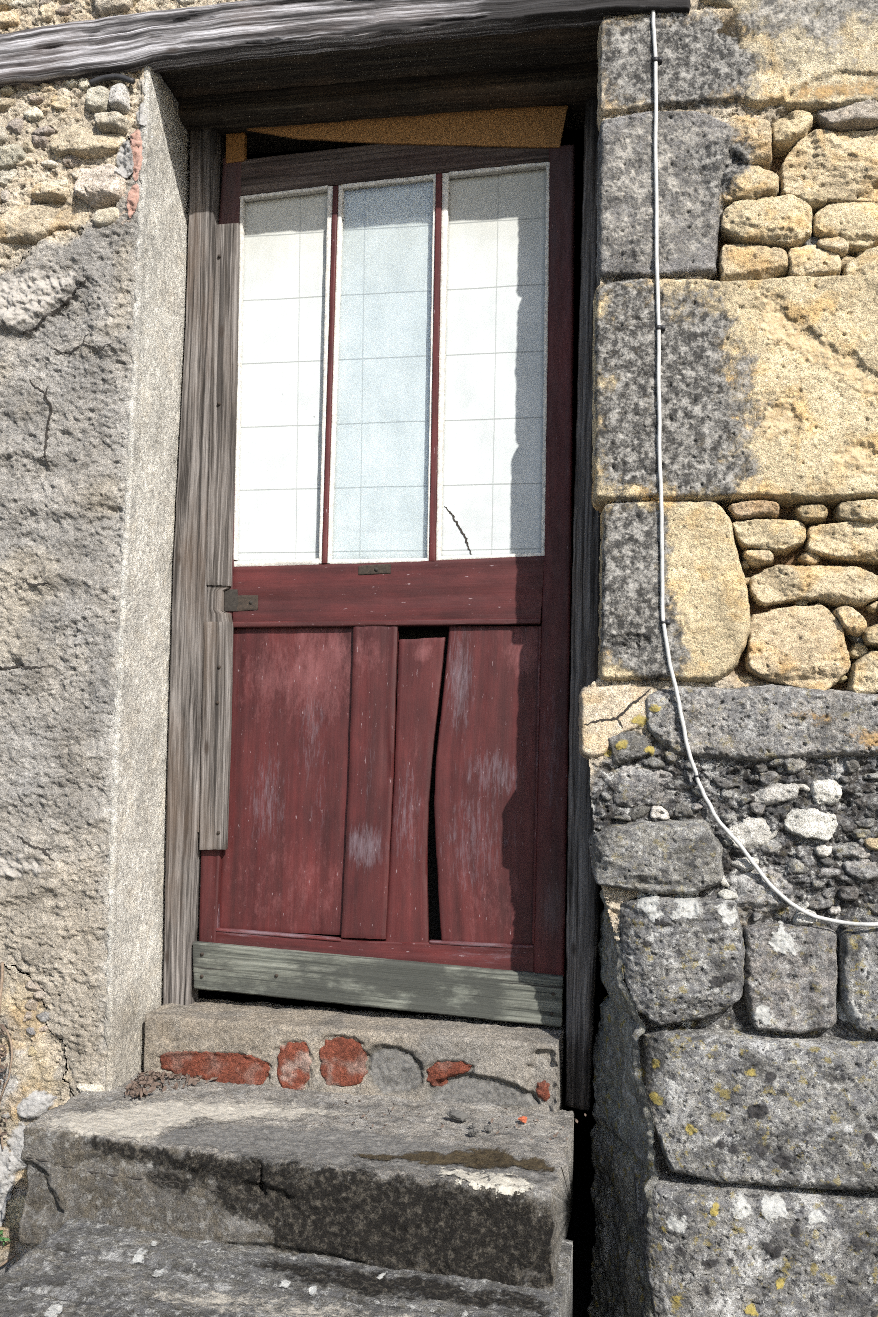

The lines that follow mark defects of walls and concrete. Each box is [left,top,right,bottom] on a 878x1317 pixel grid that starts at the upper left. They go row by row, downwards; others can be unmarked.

crack [20,279,112,354]
crack [29,379,52,467]
crack [584,688,651,728]
peeling [0,1090,54,1226]